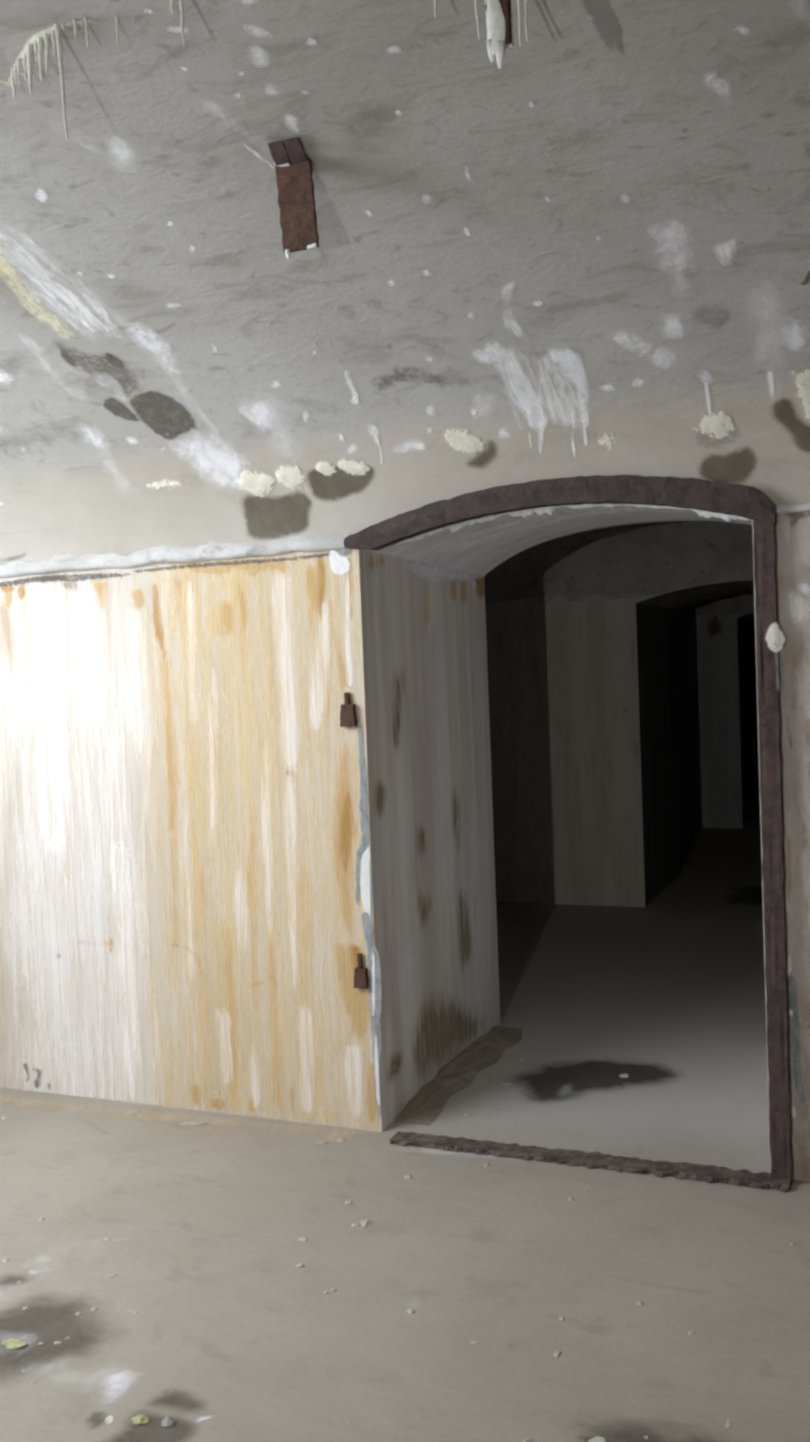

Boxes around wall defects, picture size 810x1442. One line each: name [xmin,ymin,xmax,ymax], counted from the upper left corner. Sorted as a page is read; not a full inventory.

water stain [486,0,506,55]
peeling [56,342,138,422]
water stain [129,324,178,373]
water stain [474,344,615,456]
water stain [768,368,810,453]
water stain [147,479,182,490]
water stain [788,511,810,526]
corrosion [0,578,107,680]
water stain [765,584,810,672]
corrosion [134,549,384,1130]
water stain [0,1297,105,1380]
water stain [88,1390,211,1442]